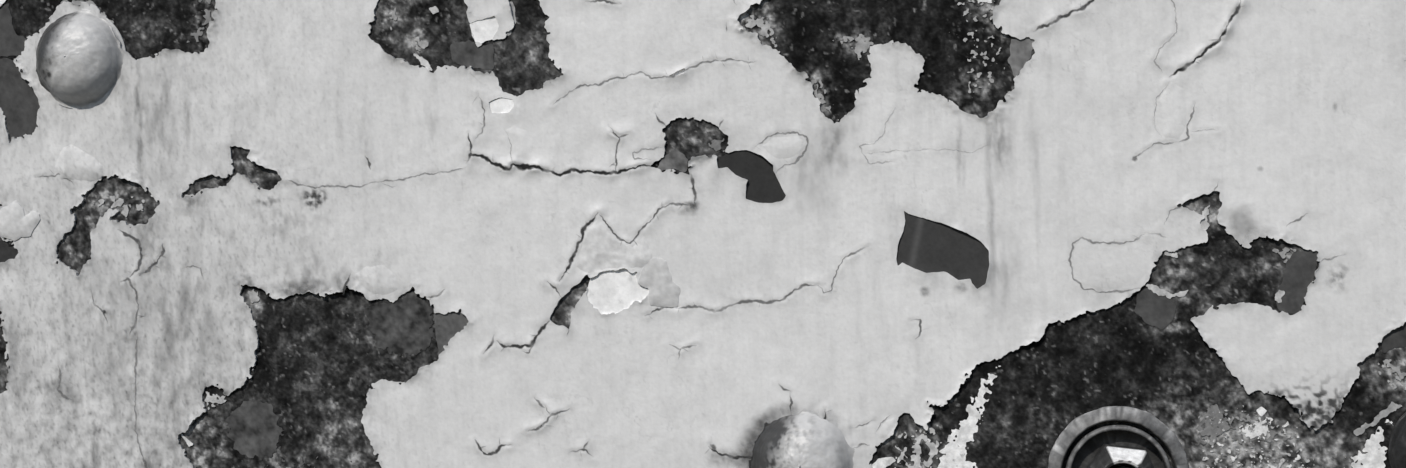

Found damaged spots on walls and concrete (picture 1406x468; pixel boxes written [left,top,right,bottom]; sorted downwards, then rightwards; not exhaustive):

peeling [470,16,499,44]
crack [556,28,741,102]
crack [1037,0,1094,29]
crack [1154,0,1240,75]
crack [292,107,664,188]
peeling [717,150,786,203]
crack [759,131,808,166]
peeling [0,200,41,241]
crack [485,178,696,353]
crack [651,250,859,313]
peeling [896,211,989,289]
rust [869,191,1406,468]